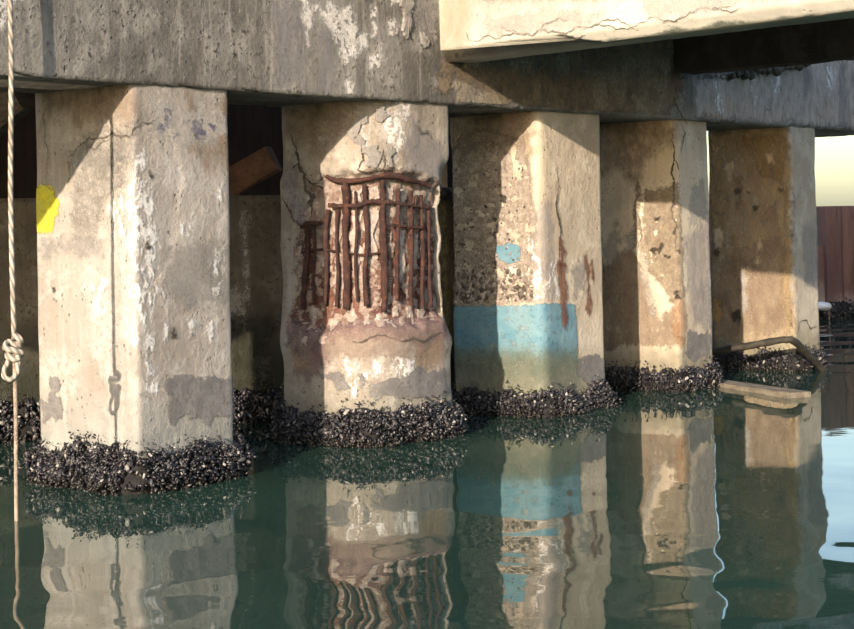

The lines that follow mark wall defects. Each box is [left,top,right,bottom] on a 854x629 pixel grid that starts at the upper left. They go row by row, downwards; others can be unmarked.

crack [466,2,741,42]
crack [282,133,327,265]
crack [357,148,394,174]
spalling [290,105,538,346]
crack [555,172,563,261]
crack [667,90,688,248]
corrosion [557,238,568,329]
corrosion [584,257,594,315]